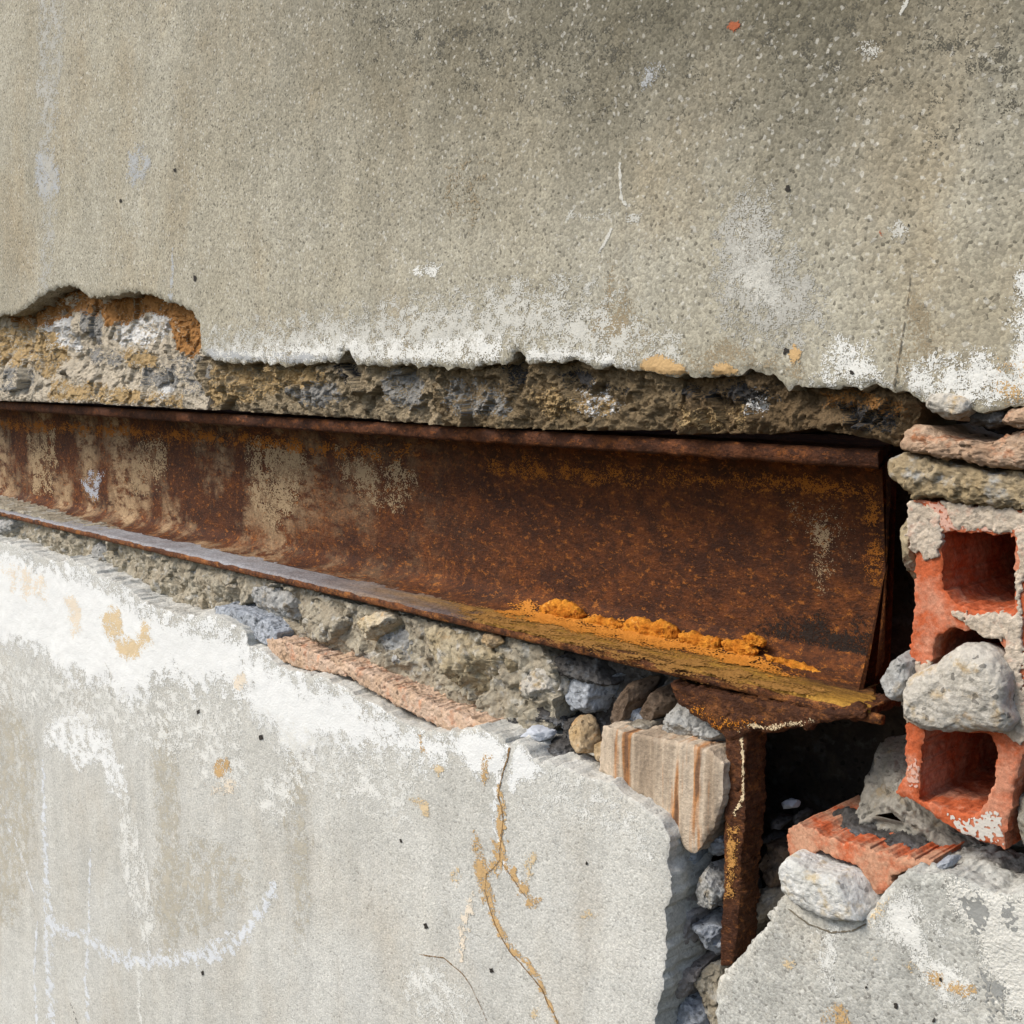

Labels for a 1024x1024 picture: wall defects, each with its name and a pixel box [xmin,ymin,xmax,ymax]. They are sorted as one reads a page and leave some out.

water stain [140,0,1024,434]
spalling [0,291,957,446]
corrosion [522,382,616,422]
corrosion [677,404,754,432]
peeling [0,545,548,826]
corrosion [0,512,843,710]
corrosion [485,454,888,599]
corrosion [857,712,885,725]
water stain [0,651,424,1024]
crack [485,747,558,1024]
corrosion [724,824,740,902]
spalling [715,843,1024,1024]